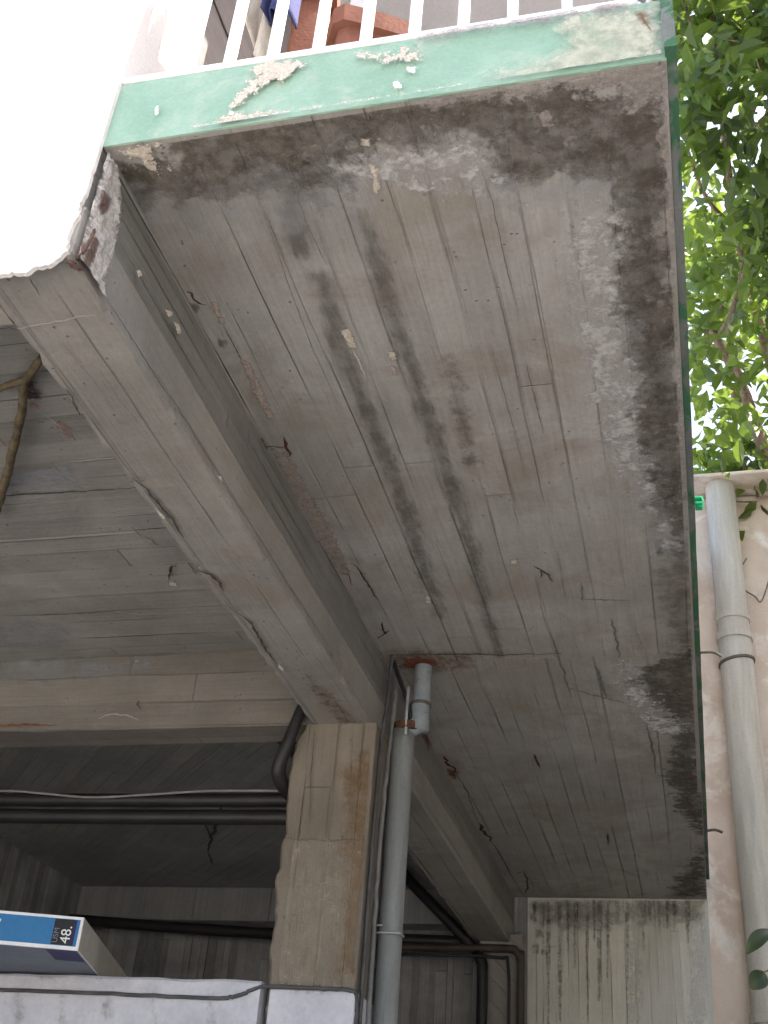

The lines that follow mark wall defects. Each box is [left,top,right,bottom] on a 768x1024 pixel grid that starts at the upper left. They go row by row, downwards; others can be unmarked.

peeling [193,58,380,127]
peeling [356,45,425,73]
rust [66,228,96,271]
spalling [78,142,172,296]
water stain [116,82,685,556]
rust [399,652,466,671]
crack [346,563,646,702]
crack [646,724,656,774]
water stain [607,646,703,834]
crack [205,807,222,864]
crack [444,756,529,893]
water stain [666,848,706,927]